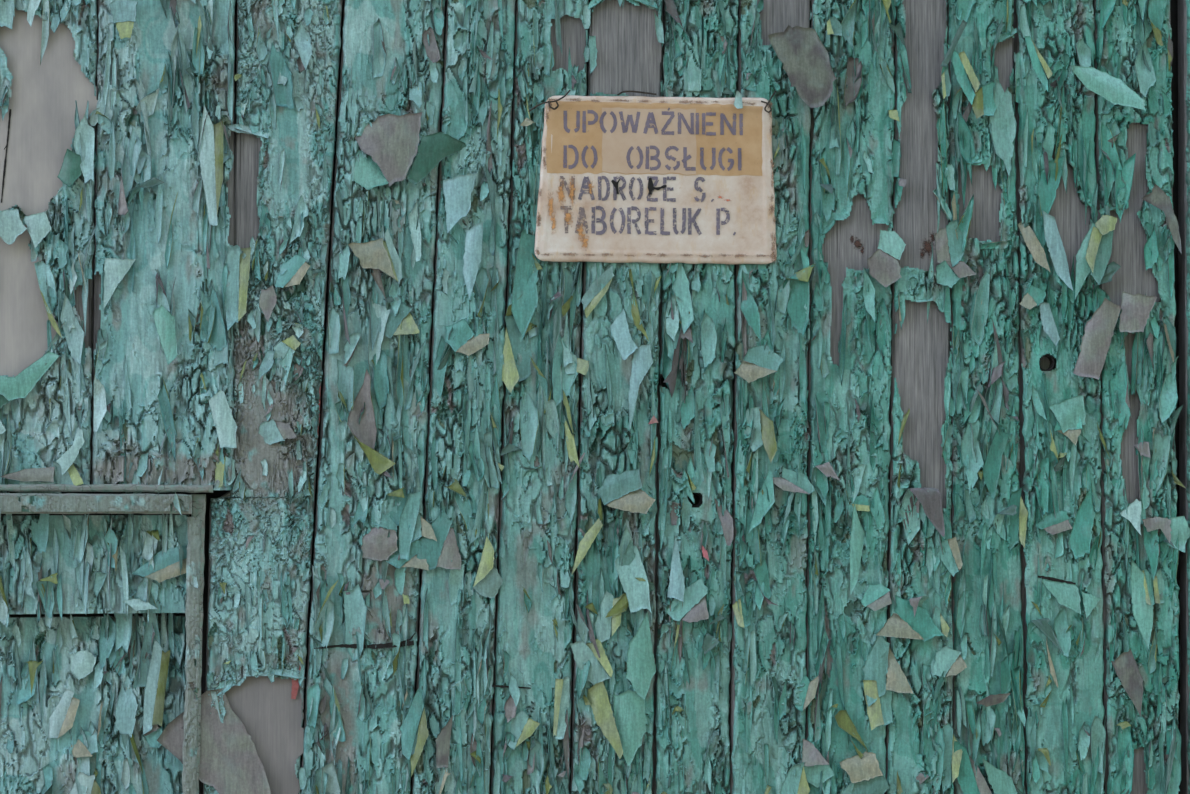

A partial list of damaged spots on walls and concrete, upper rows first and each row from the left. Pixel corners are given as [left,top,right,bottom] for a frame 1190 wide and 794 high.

peeling [0,0,100,486]
peeling [0,492,202,794]
peeling [92,0,836,794]
peeling [795,0,1190,794]